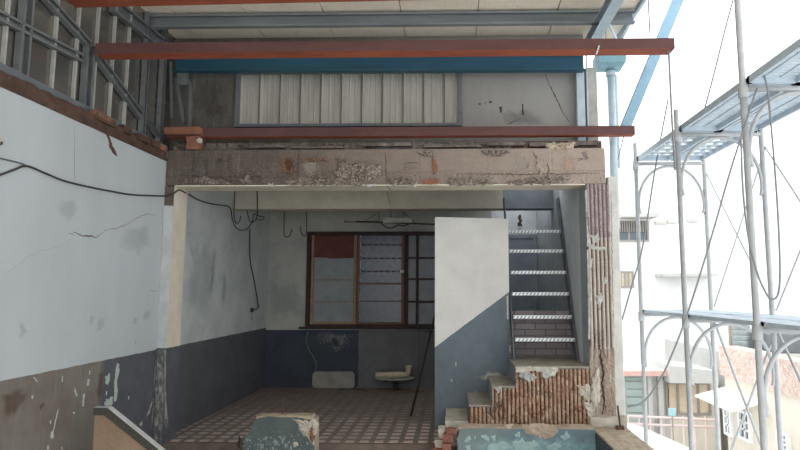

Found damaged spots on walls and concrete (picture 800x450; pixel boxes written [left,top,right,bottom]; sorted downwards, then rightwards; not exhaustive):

spalling [203,141,602,163]
spalling [446,175,571,186]
crack [5,213,163,275]
spalling [585,190,607,340]
peeling [104,363,120,406]
spalling [464,366,601,450]
crack [599,345,615,414]